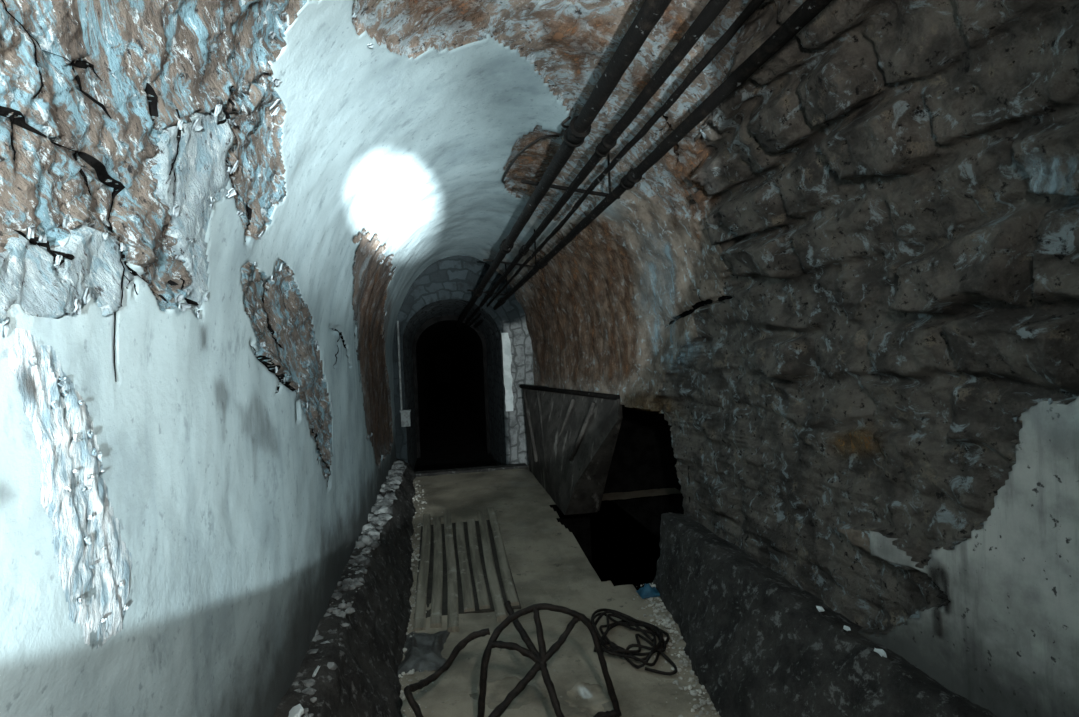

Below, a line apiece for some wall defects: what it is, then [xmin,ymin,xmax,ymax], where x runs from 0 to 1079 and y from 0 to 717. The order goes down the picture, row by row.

flaking render [0,0,319,648]
flaking render [240,259,334,479]
flaking render [352,0,1079,637]